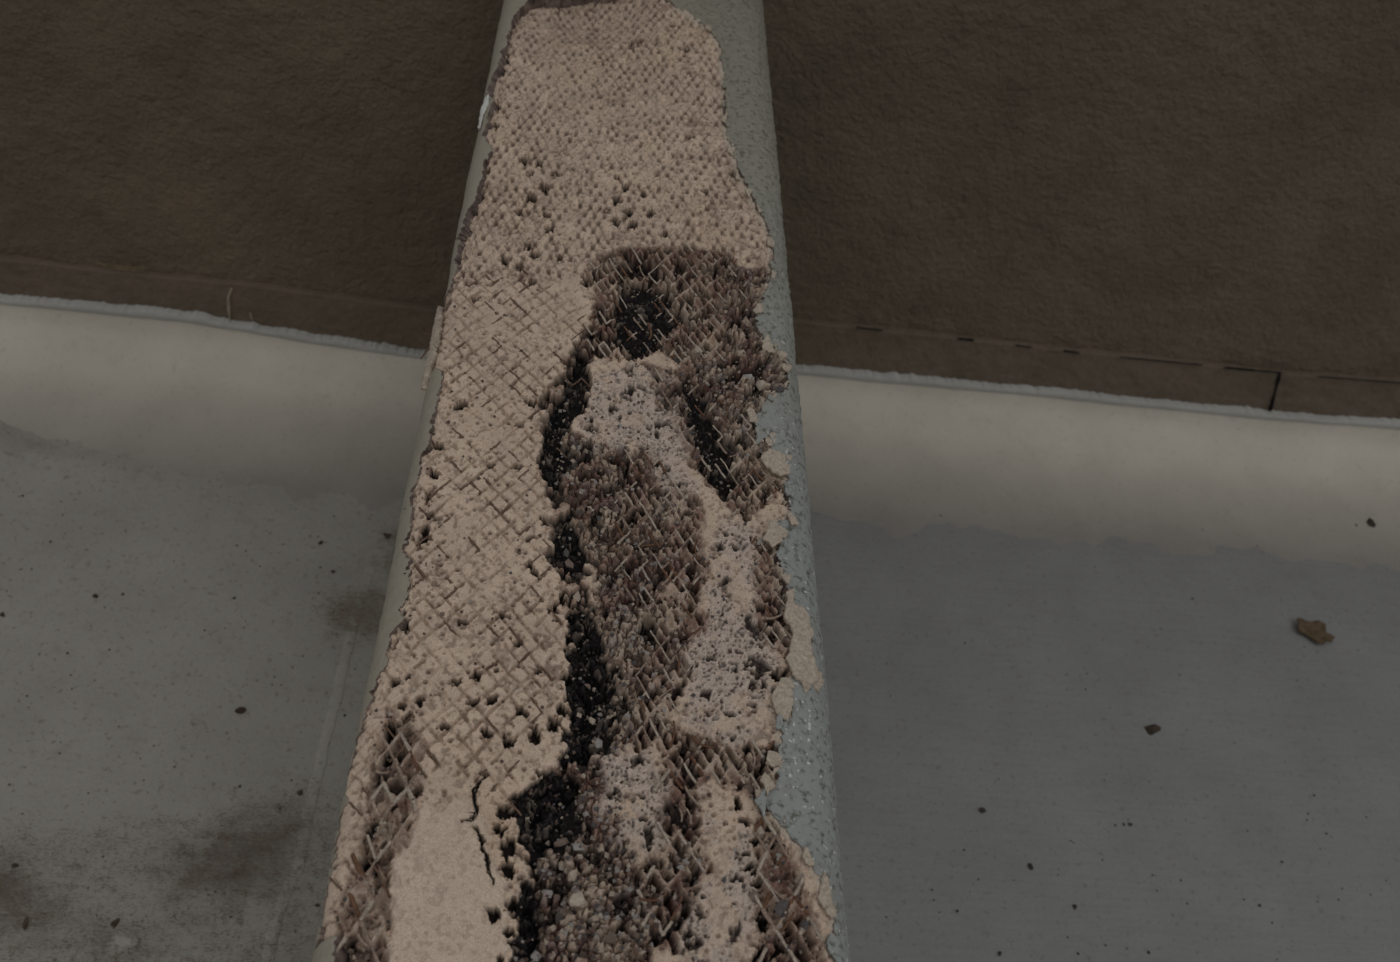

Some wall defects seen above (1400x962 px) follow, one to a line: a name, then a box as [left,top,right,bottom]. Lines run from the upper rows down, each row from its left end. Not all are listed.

spalling [322,0,842,962]